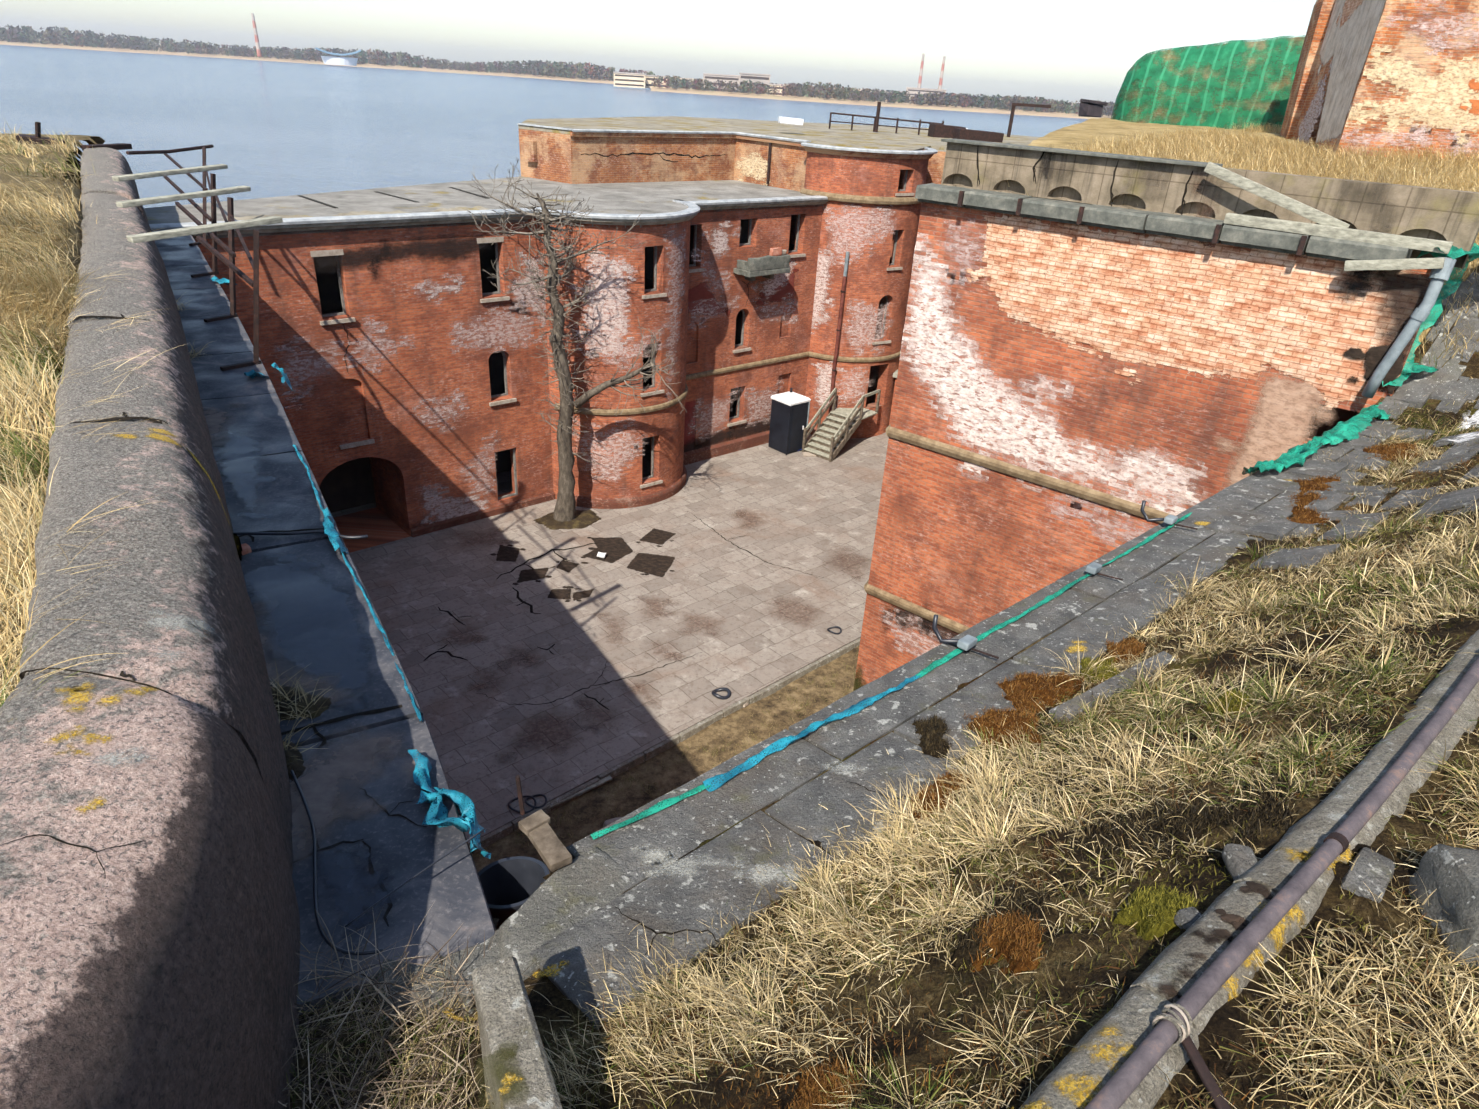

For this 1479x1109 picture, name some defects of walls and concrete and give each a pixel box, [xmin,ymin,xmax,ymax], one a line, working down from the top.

peeling [1371,44,1393,61]
peeling [1349,100,1403,132]
spalling [1460,79,1479,115]
water stain [315,235,486,274]
spalling [965,209,1431,422]
water stain [1342,270,1429,359]
water stain [902,224,1205,543]
crack [497,543,598,654]
crack [19,667,206,711]
crack [478,652,701,710]
crack [2,834,145,878]
crack [293,787,427,927]